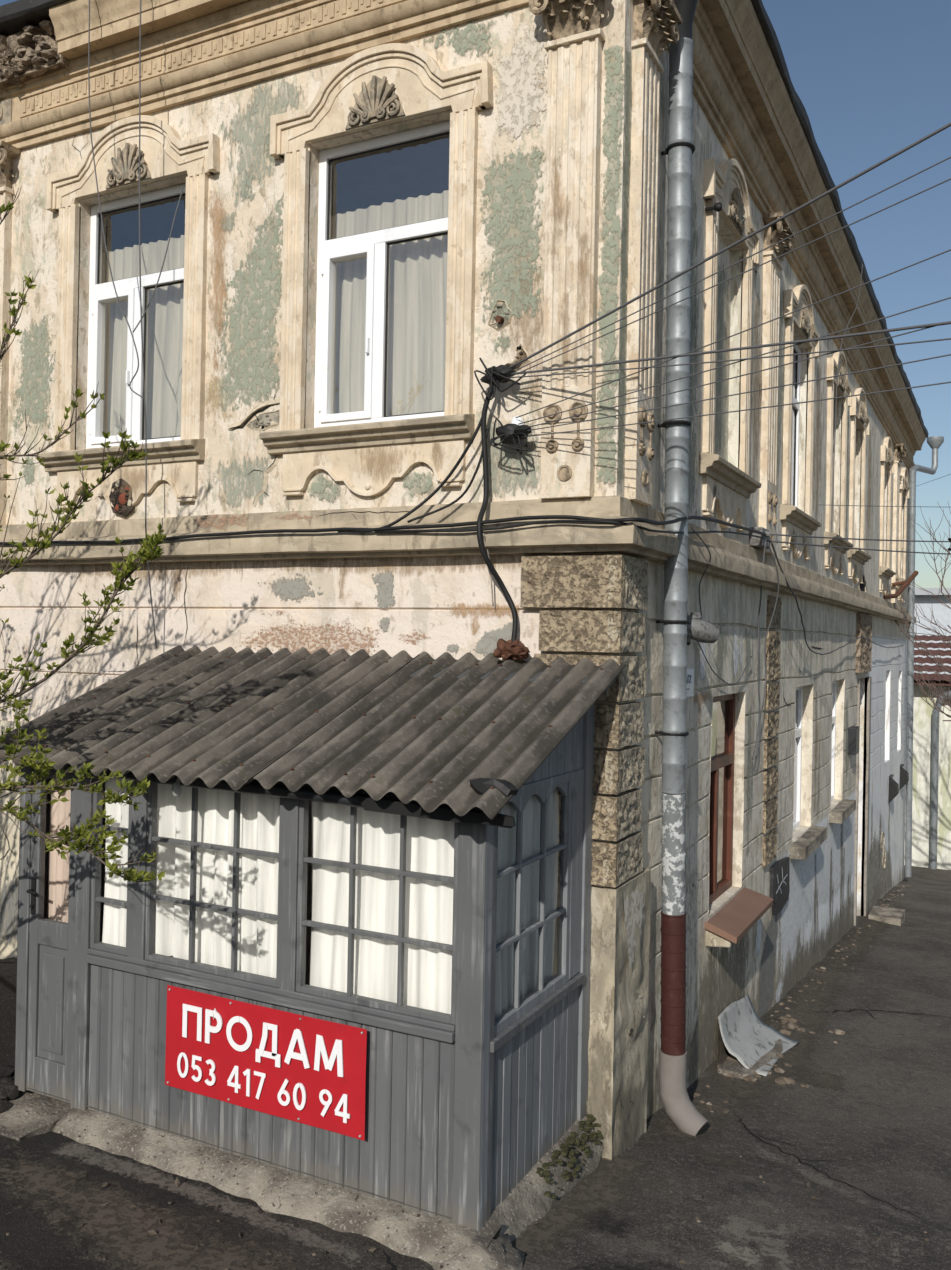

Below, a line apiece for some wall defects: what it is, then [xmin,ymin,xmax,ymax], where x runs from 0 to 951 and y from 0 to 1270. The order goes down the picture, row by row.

peeling [218,193,284,431]
peeling [221,77,307,235]
peeling [423,21,548,372]
peeling [195,455,268,530]
flaking render [237,611,428,655]
water stain [689,805,892,1079]